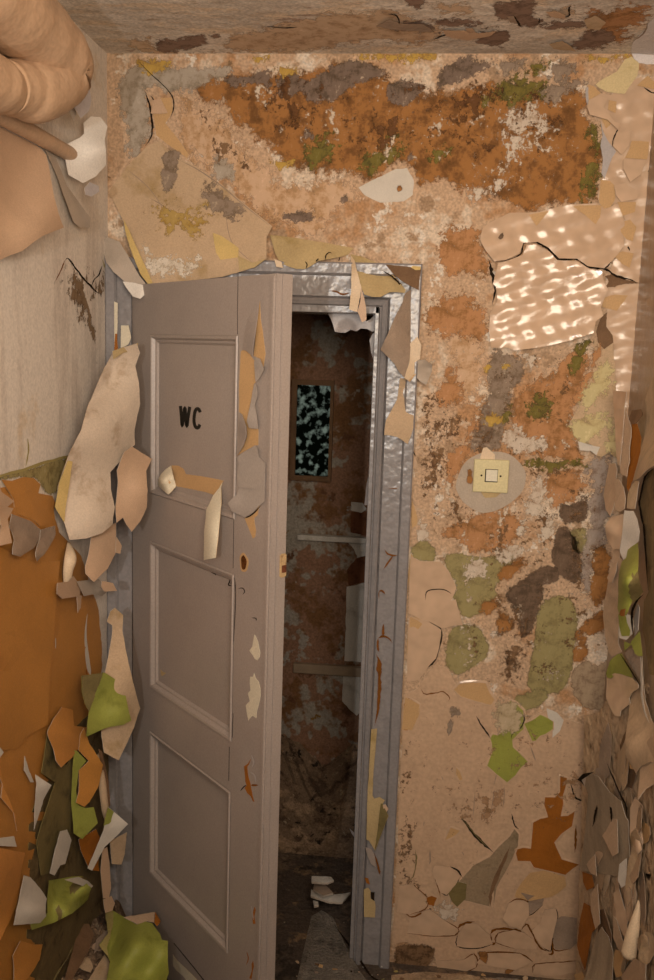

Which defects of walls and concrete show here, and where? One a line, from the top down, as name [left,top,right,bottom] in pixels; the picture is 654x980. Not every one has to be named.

leakage [128,0,652,204]
peeling [0,127,64,260]
leakage [283,210,314,224]
peeling [65,90,432,488]
crack [488,242,637,304]
crack [596,313,613,349]
spalling [350,476,369,535]
peeling [397,76,654,980]
spalling [347,556,365,586]
peeling [0,300,266,980]
crack [462,819,493,852]
crack [411,850,463,893]